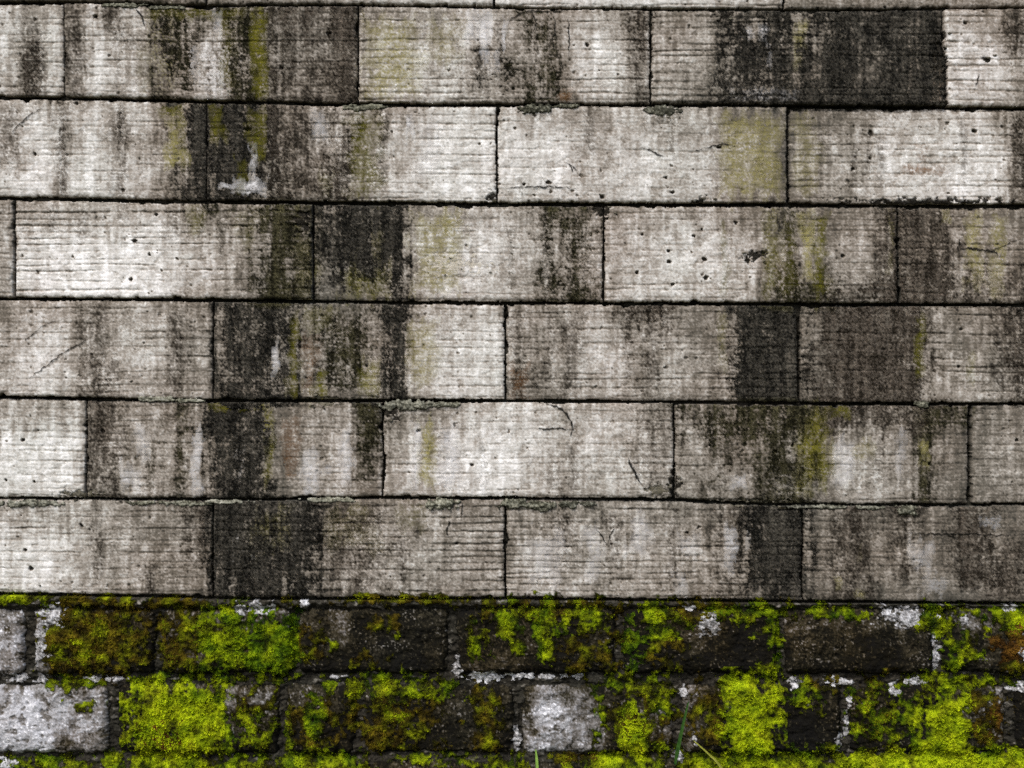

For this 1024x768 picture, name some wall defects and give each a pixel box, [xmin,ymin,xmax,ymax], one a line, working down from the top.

leakage [627,11,657,100]
leakage [707,6,945,110]
leakage [137,1,414,597]
crack [31,340,85,377]
crack [538,403,575,440]
leakage [647,208,1024,600]